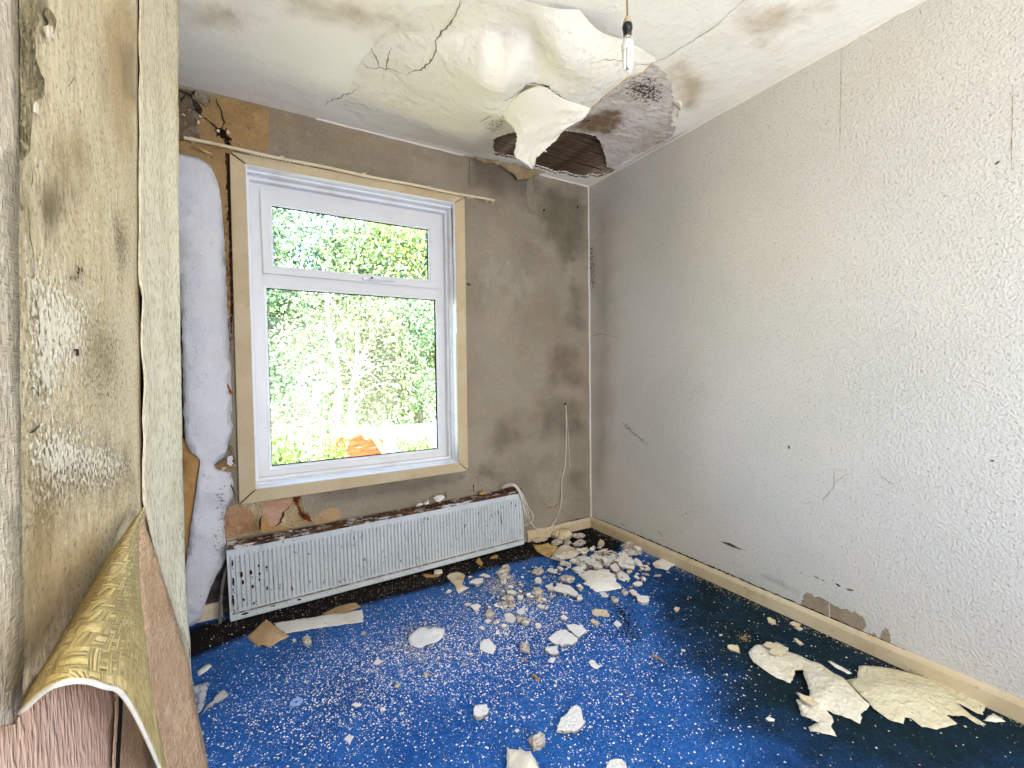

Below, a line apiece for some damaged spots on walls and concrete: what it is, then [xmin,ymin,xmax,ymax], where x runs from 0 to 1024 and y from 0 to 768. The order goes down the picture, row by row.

crack [326,2,460,104]
damp [578,110,620,134]
flaking render [565,64,676,169]
mould [621,74,668,105]
crack [178,89,234,341]
flaking render [205,496,341,615]
peeling [801,592,891,643]